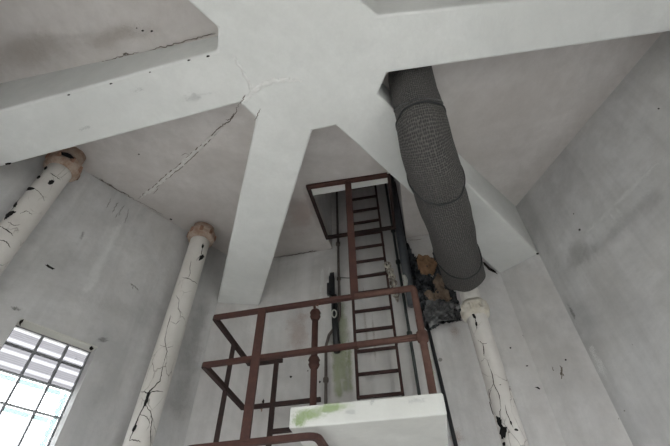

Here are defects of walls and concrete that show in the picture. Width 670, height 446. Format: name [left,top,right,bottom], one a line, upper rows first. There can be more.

crack [102,34,211,62]
crack [99,96,245,223]
crack [129,297,182,446]
crack [475,319,513,427]
peeling [489,402,518,446]